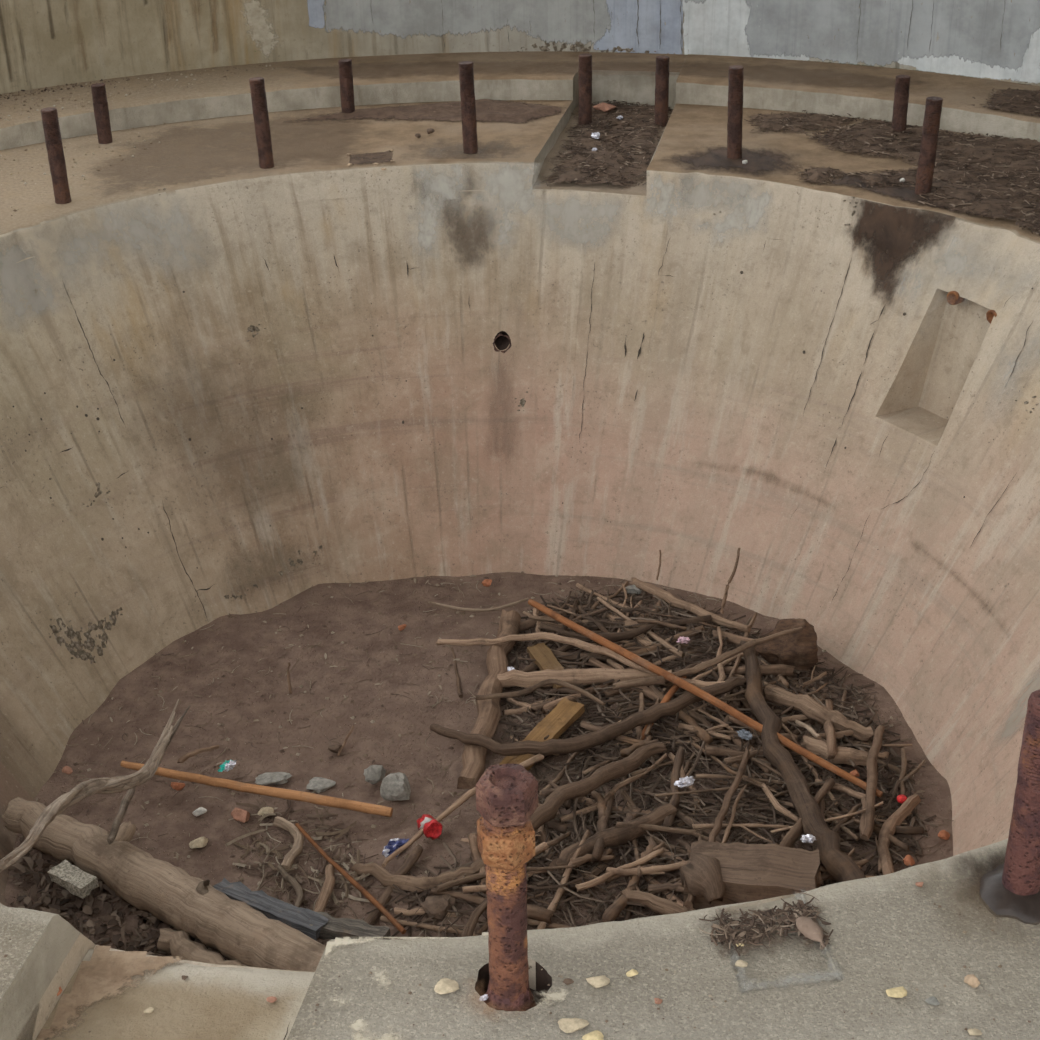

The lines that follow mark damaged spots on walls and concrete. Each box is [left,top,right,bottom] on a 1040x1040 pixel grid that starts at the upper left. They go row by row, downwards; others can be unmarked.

peeling [307,0,1040,84]
water stain [418,143,532,263]
water stain [831,173,957,298]
crack [804,258,852,410]
crack [825,296,890,469]